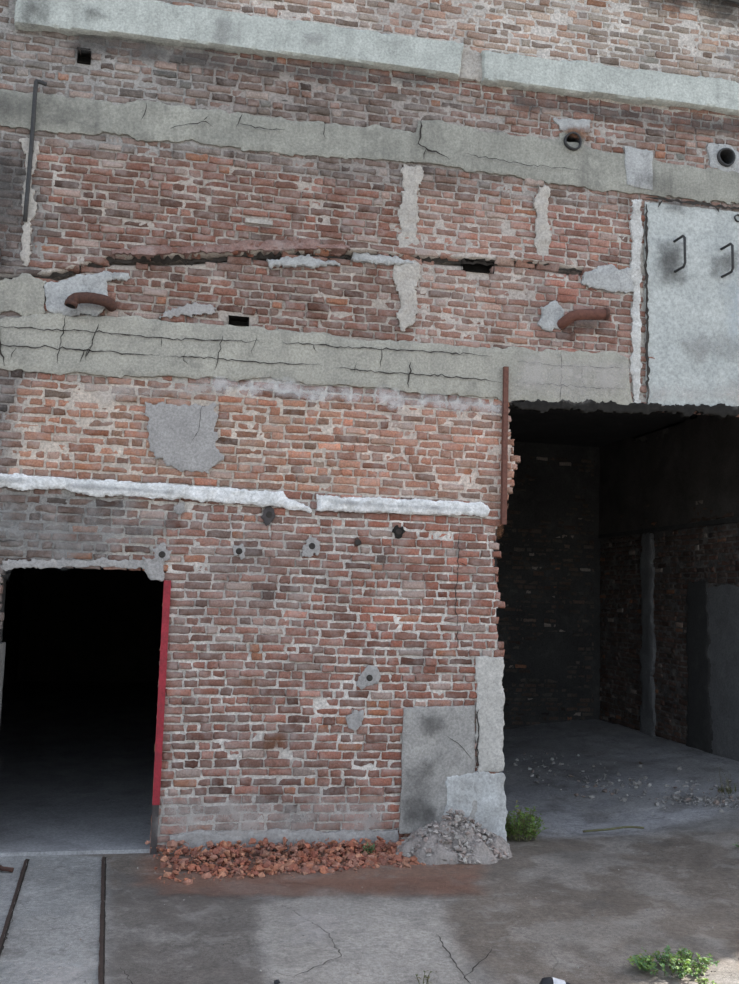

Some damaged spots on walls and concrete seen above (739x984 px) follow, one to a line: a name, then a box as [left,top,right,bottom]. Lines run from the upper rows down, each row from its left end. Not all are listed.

crack [418,119,577,170]
crack [0,197,739,404]